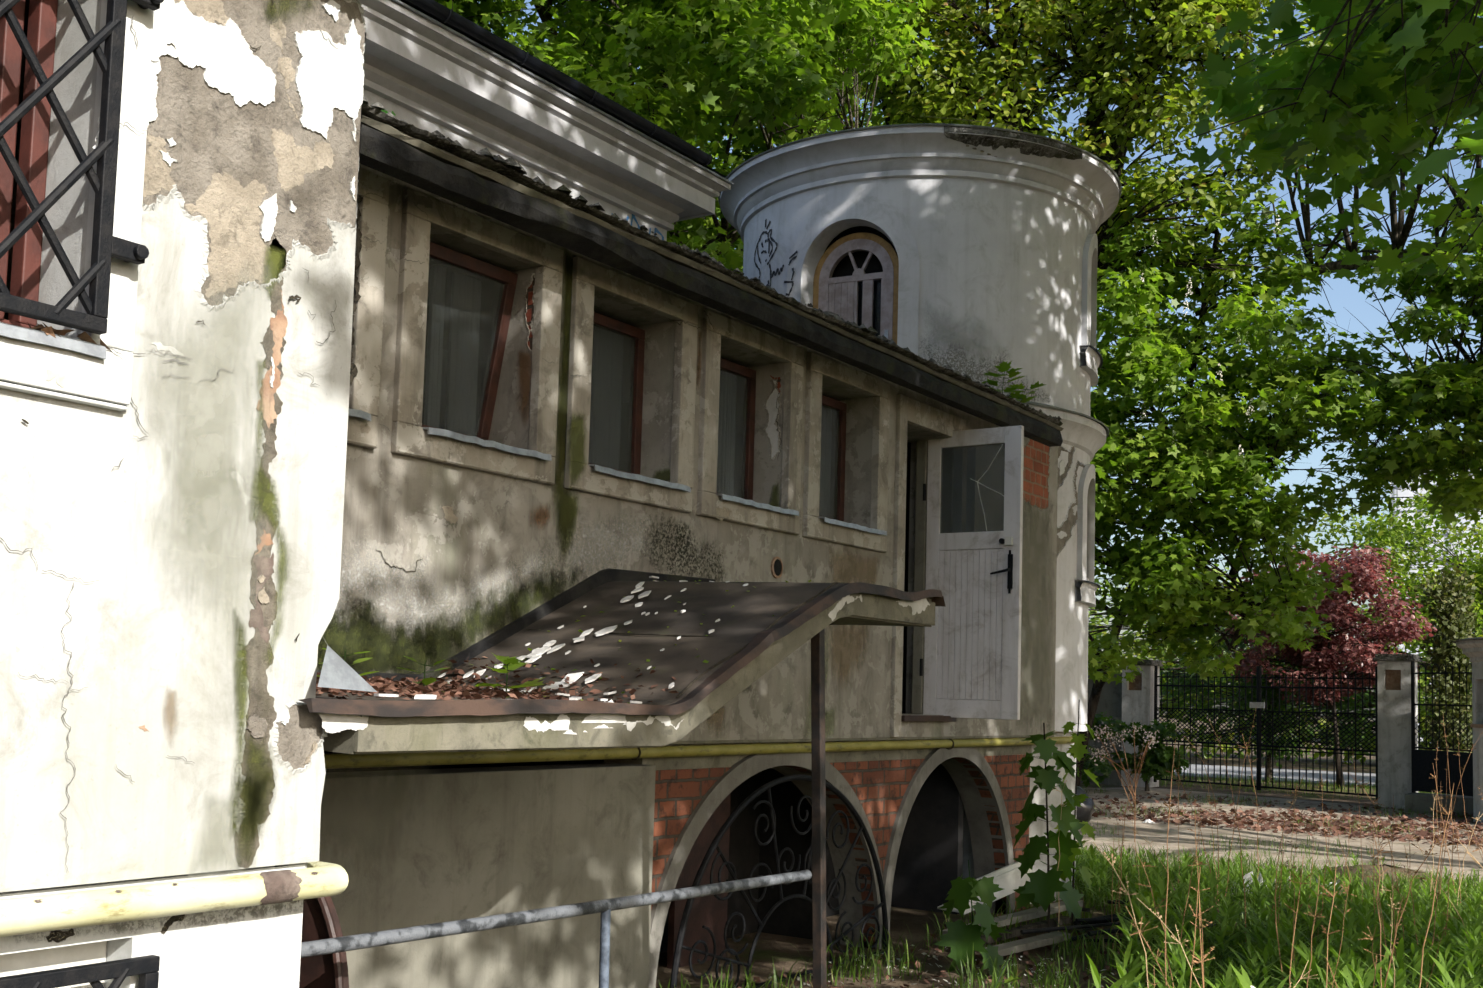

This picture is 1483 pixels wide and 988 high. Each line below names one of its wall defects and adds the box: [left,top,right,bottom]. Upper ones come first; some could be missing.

peeling [142,0,369,868]
water stain [559,255,573,472]
crack [0,537,99,871]
water stain [203,621,275,863]
water stain [328,493,724,674]
peeling [523,699,684,735]